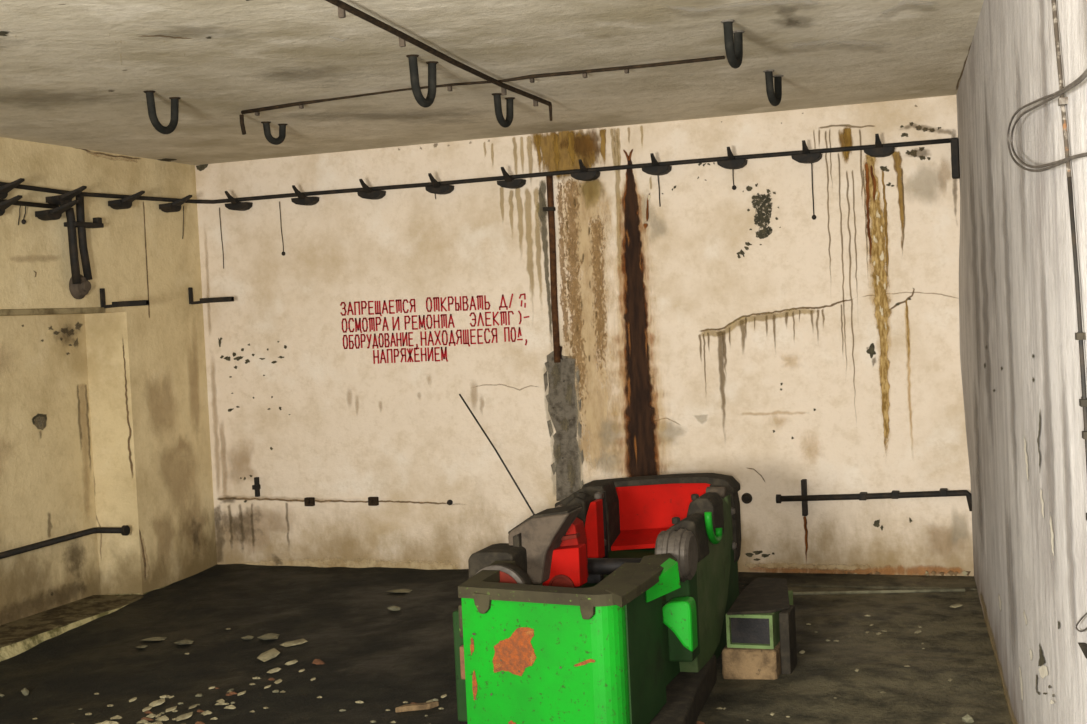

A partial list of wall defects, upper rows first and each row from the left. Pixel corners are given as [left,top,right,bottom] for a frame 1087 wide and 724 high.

water stain [533,129,617,466]
rust [620,149,658,477]
water stain [737,183,781,258]
rust [865,152,905,448]